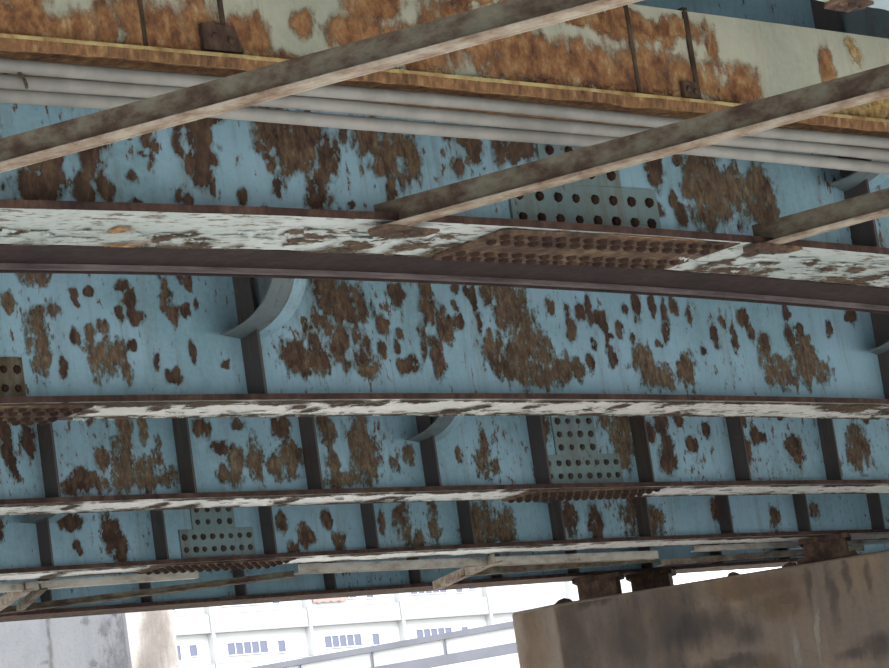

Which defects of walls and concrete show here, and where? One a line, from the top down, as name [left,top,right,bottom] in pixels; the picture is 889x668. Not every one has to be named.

corrosion [0,0,299,59]
corrosion [324,0,506,47]
corrosion [395,6,763,104]
corrosion [2,144,116,202]
corrosion [127,132,159,164]
corrosion [172,117,222,205]
corrosion [252,121,422,210]
corrosion [608,154,780,241]
corrosion [100,226,251,251]
peeling [0,228,479,248]
peeling [731,248,764,273]
corrosion [0,273,889,580]